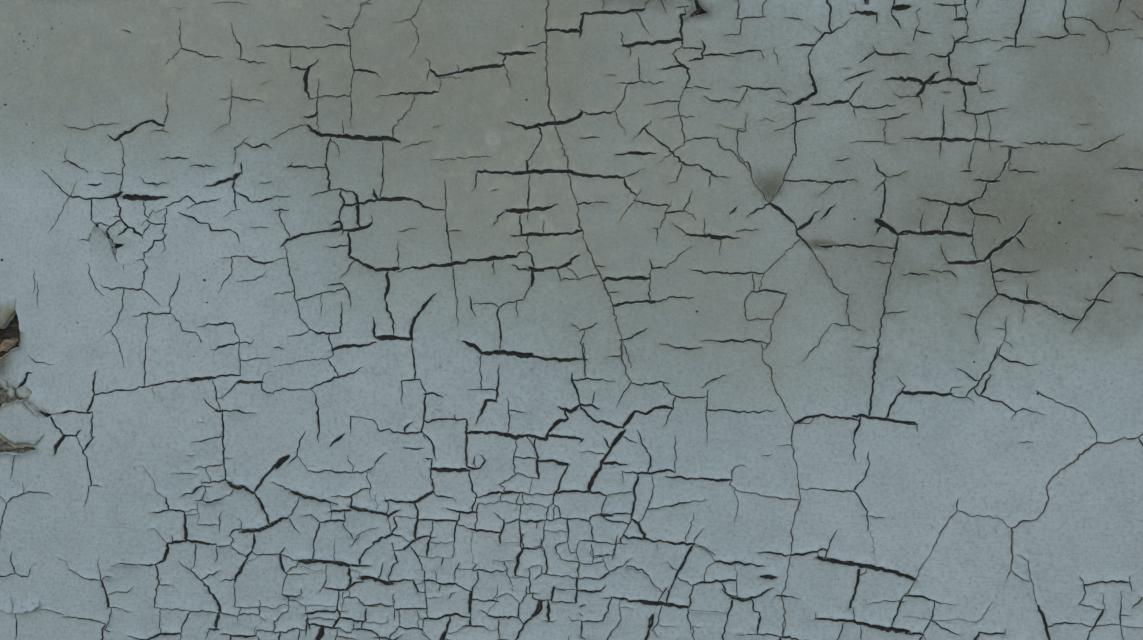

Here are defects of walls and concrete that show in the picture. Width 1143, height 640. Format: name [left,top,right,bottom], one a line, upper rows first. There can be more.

peeling [690,0,707,17]
crack [1036,0,1131,52]
crack [206,137,289,217]
crack [1023,134,1123,152]
crack [42,92,240,366]
crack [941,215,1143,344]
peeling [0,292,20,358]
crack [17,355,51,389]
peeling [0,378,51,454]
crack [45,300,300,640]
crack [0,455,51,577]
crack [998,390,1143,640]